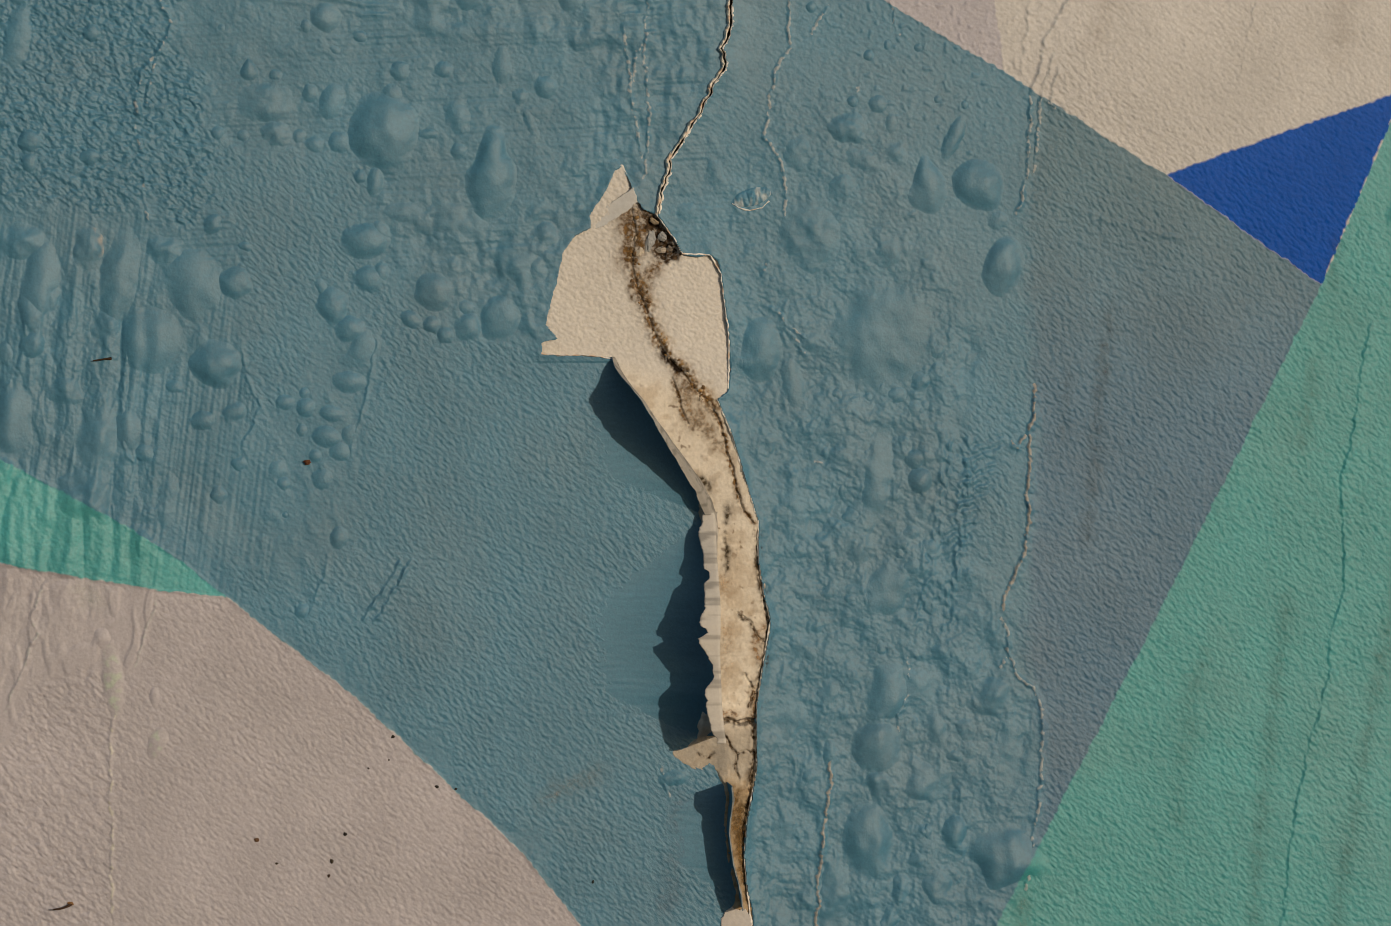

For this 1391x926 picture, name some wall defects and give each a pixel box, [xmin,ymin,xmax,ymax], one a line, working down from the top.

crack [760,0,832,217]
crack [1013,0,1078,219]
peeling [541,165,771,926]
crack [620,0,770,891]
crack [998,382,1050,893]